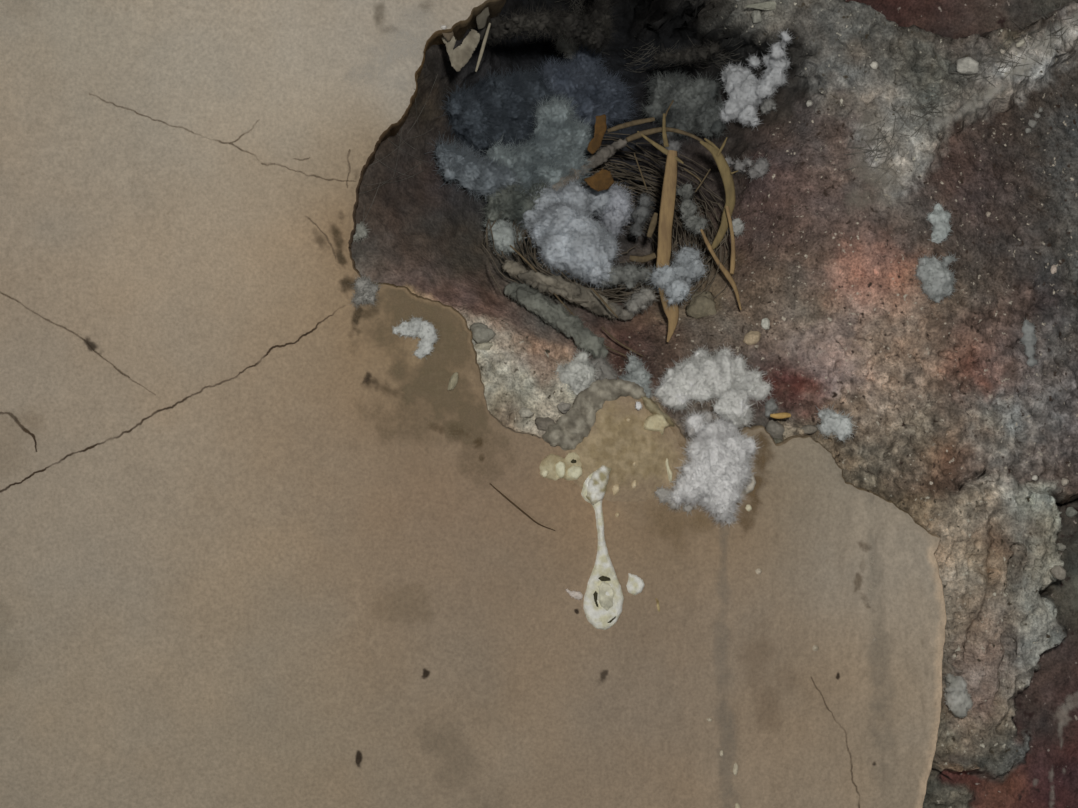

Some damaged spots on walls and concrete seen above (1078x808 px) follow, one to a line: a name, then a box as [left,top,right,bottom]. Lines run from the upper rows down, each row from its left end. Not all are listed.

water stain [333,229,346,264]
crack [45,319,140,385]
crack [0,387,206,492]
crack [239,315,332,374]
water stain [353,290,485,446]
spalling [348,0,1078,808]